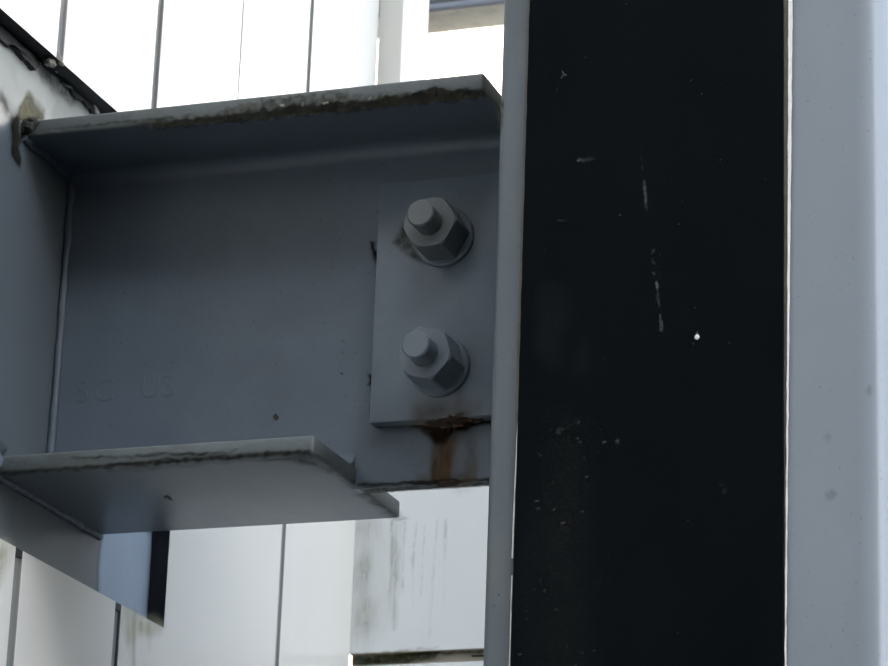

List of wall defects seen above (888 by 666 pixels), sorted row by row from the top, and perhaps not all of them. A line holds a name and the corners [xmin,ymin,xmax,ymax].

corrosion [413,420,491,480]